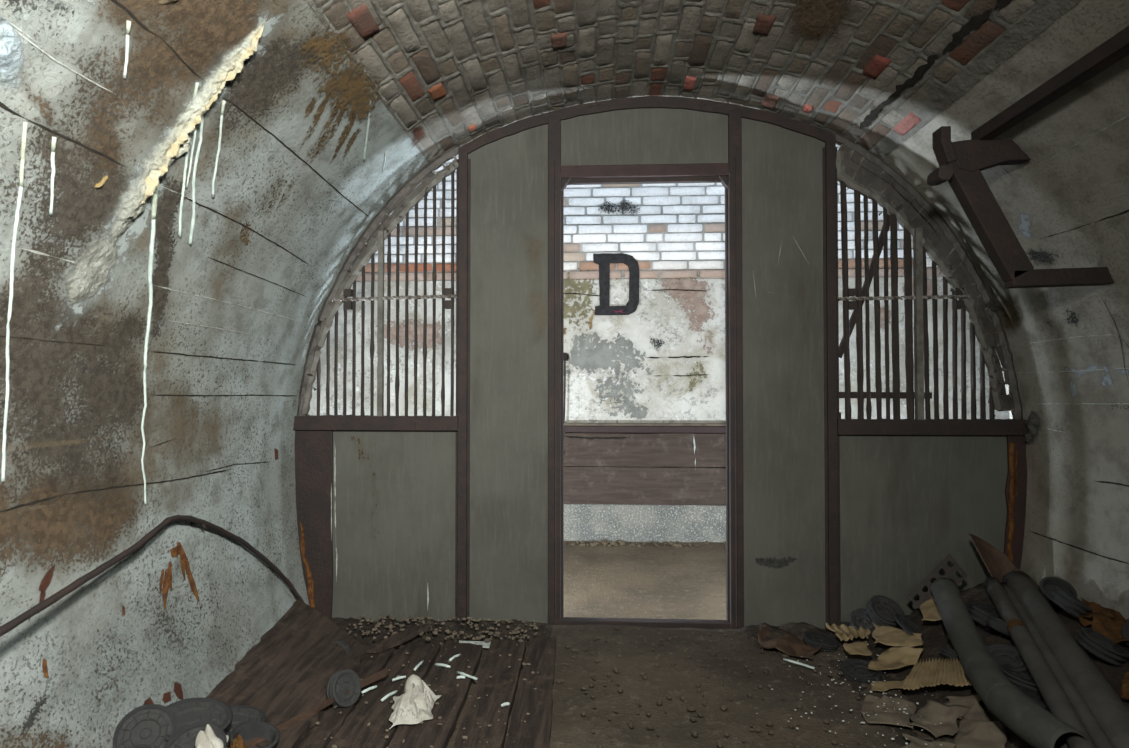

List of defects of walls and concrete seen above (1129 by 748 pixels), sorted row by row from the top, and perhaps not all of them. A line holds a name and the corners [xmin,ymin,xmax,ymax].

crack [2,17,115,94]
crack [0,102,124,166]
crack [111,0,369,217]
corrosion [301,94,361,165]
crack [164,187,309,265]
damp [0,0,388,576]
crack [211,258,304,296]
crack [0,462,266,512]
crack [1095,480,1129,488]
corrosion [39,565,55,602]
corrosion [160,542,199,610]
damp [0,564,234,748]